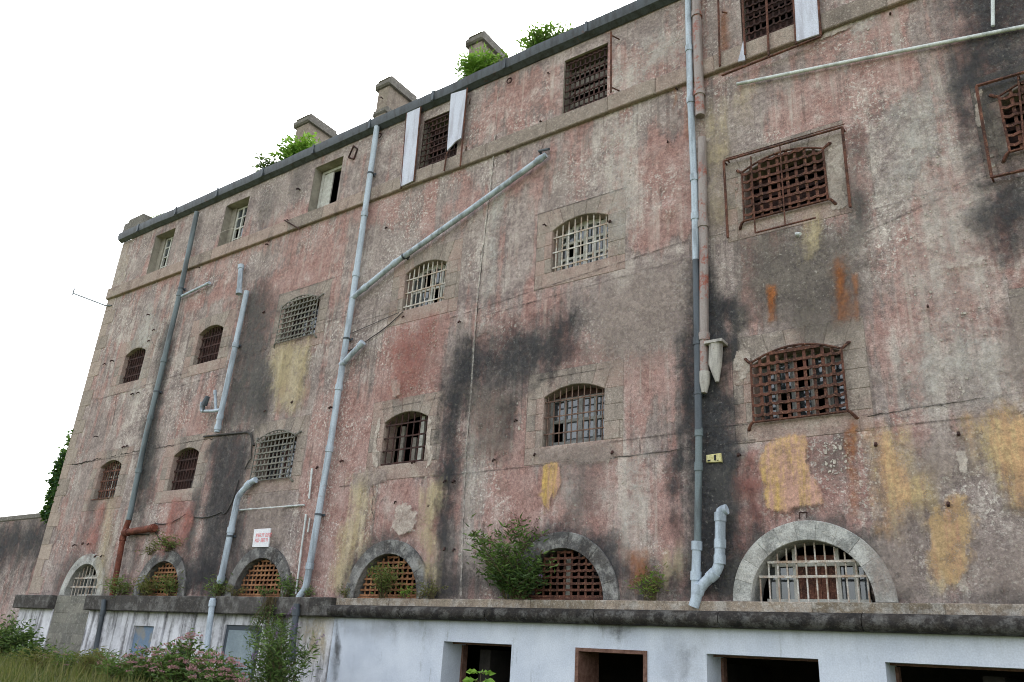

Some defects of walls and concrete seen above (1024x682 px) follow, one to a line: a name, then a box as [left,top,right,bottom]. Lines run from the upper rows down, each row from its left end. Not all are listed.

damp [949,0,1024,242]
damp [168,281,309,596]
peeling [390,501,418,535]
damp [424,312,580,597]
damp [599,229,862,600]
damp [857,534,903,596]